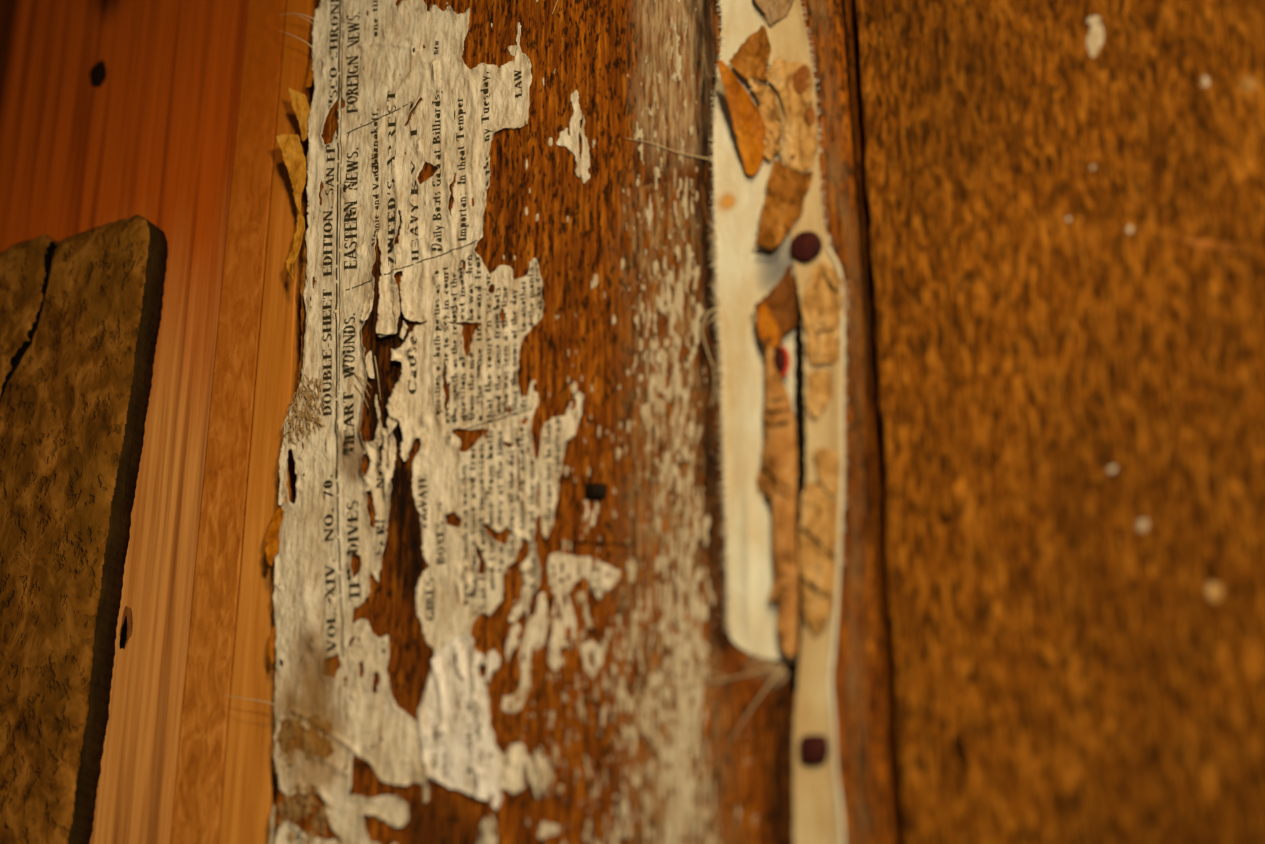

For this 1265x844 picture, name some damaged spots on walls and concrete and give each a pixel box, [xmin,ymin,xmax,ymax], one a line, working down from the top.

crack [0,241,58,402]
peeling [522,0,724,844]